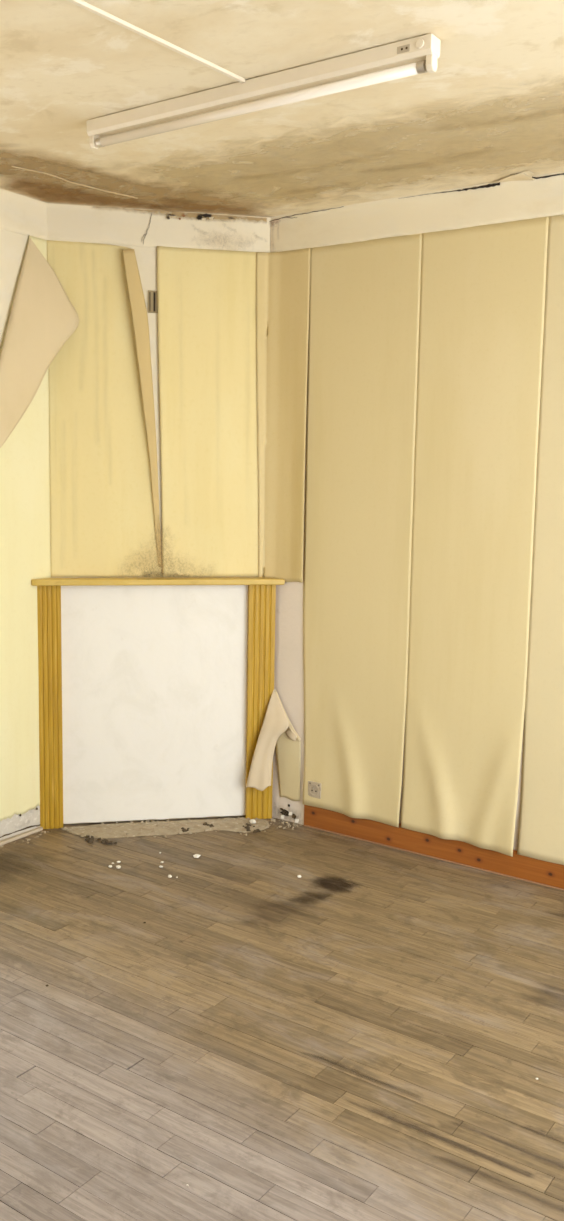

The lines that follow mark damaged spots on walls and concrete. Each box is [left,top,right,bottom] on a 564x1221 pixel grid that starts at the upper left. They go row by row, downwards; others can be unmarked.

damp [0,96,564,222]